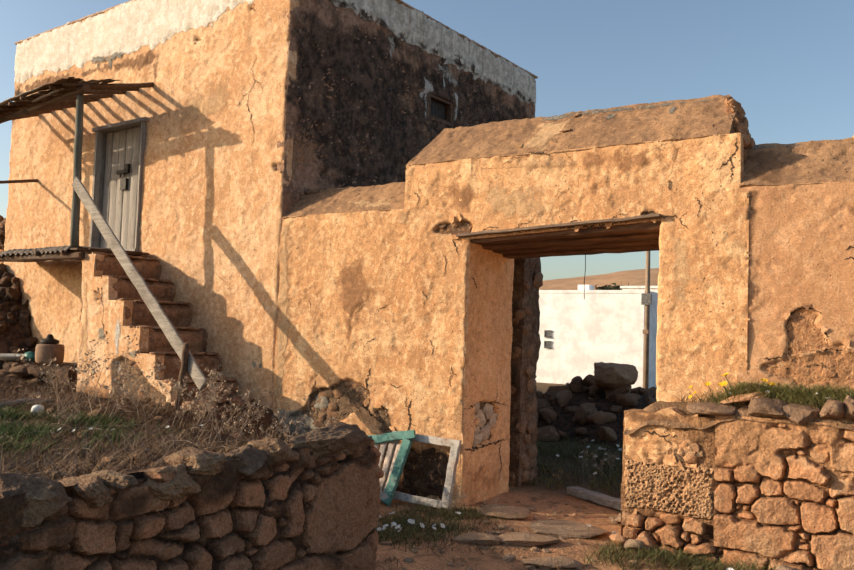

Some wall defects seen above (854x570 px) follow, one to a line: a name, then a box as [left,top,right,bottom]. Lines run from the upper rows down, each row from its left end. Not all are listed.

damp [286,0,532,200]
crack [716,138,738,182]
spalling [435,213,473,253]
damp [449,186,472,210]
damp [338,265,368,339]
spalling [762,304,854,395]
spalling [294,380,395,455]
spalling [472,401,501,448]